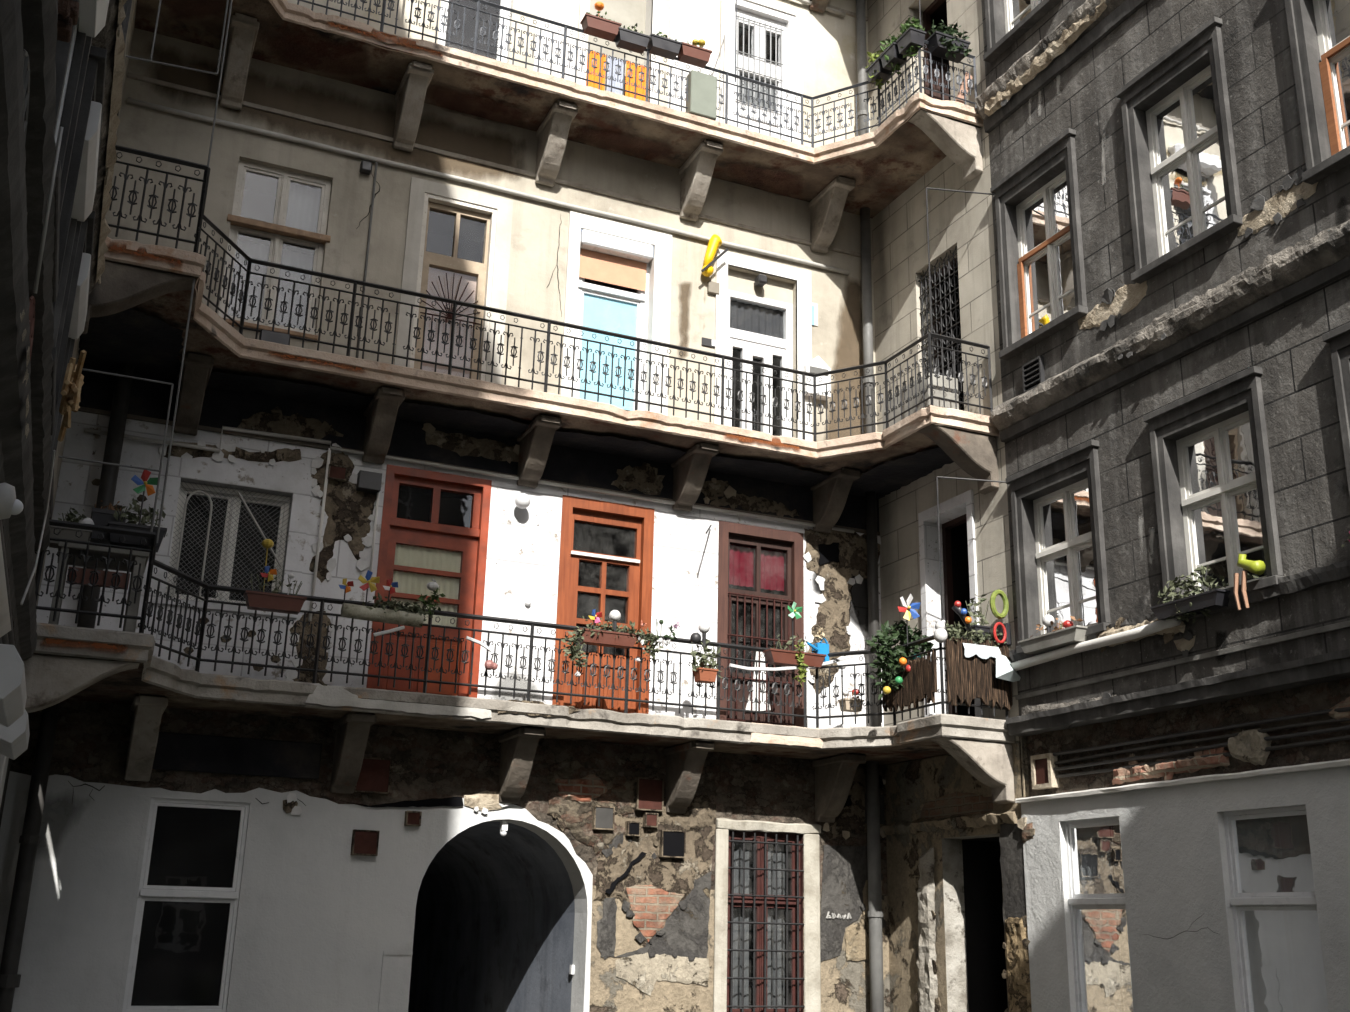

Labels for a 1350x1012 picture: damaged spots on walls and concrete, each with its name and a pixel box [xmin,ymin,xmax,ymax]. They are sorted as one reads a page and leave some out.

peeling [1237,166,1318,239]
peeling [1078,224,1341,360]
peeling [159,406,377,583]
peeling [703,478,881,694]
peeling [823,767,886,840]
peeling [1112,746,1230,785]
peeling [547,761,717,996]
peeling [845,873,886,961]